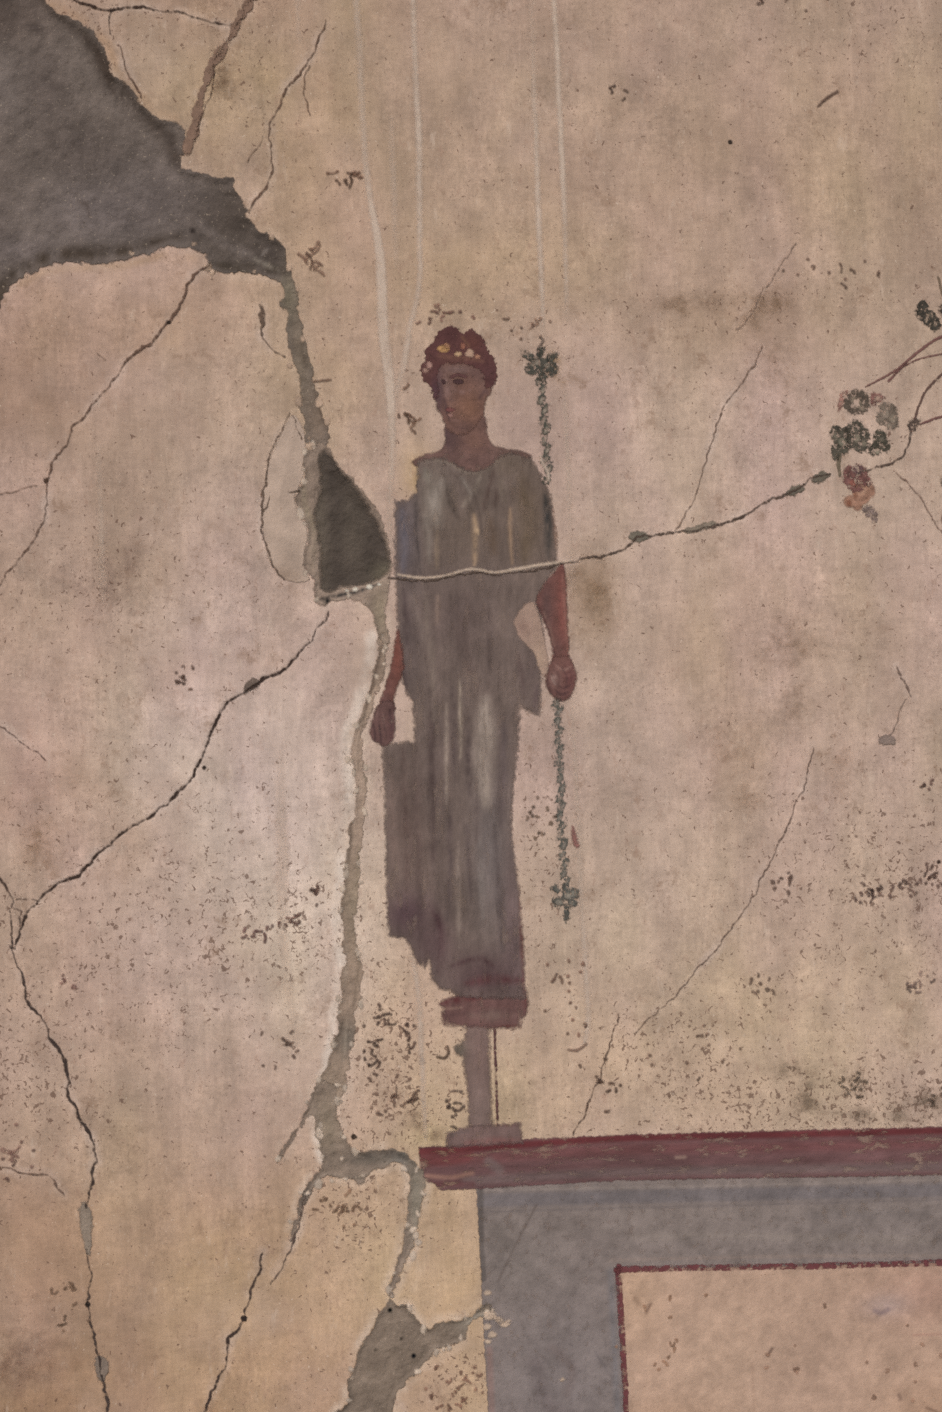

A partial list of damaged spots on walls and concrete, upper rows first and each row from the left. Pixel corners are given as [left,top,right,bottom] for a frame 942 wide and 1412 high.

crack [75,0,253,155]
crack [247,22,326,210]
crack [0,264,210,584]
crack [258,304,285,357]
crack [260,415,302,579]
crack [388,243,942,582]
flaking render [0,0,510,1412]
crack [0,611,329,1208]
crack [87,1256,110,1412]
crack [205,1197,306,1411]